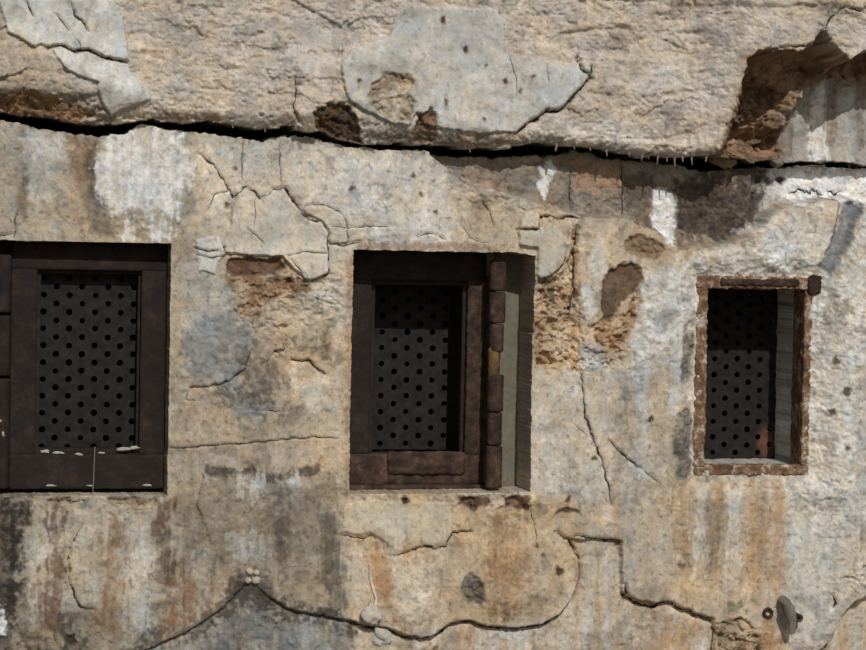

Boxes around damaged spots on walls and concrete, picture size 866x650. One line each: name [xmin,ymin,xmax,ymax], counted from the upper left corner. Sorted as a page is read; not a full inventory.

spalling [725,45,805,161]
spalling [836,52,866,80]
crack [202,140,388,281]
spalling [195,235,314,323]
leakage [574,337,613,380]
spalling [533,226,668,370]
leakage [612,70,866,643]
crack [575,372,611,500]
crack [67,526,88,610]
leakage [0,459,536,650]
crack [273,510,621,640]
leakage [573,610,710,650]